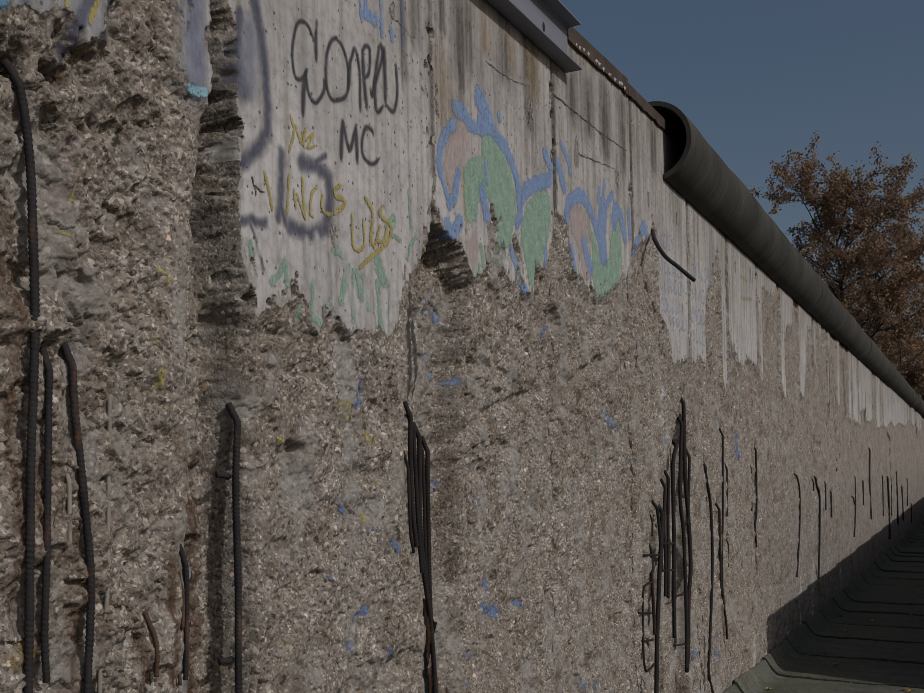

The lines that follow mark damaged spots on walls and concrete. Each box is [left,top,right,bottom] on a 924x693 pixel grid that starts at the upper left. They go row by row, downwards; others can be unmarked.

spalling [0,0,560,693]
spalling [546,199,924,693]